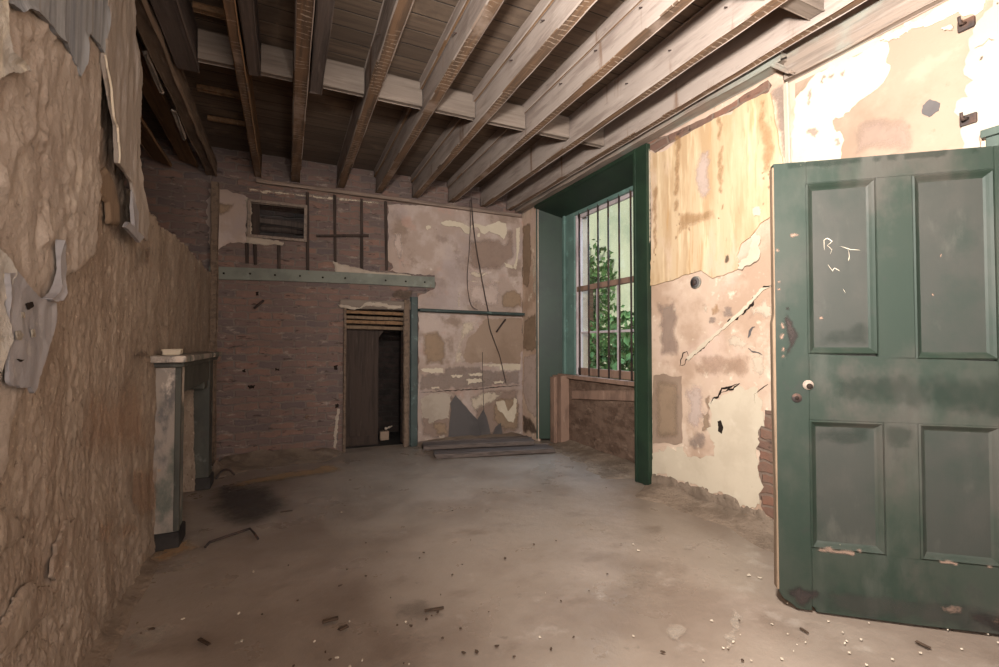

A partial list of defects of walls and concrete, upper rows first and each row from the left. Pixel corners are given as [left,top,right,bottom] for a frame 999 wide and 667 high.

peeling [791,0,999,163]
flaking render [0,0,150,482]
flaking render [426,220,520,269]
flaking render [420,317,523,438]
crack [680,285,771,366]
crack [711,383,768,402]
water stain [216,465,338,520]
flaking render [651,410,774,523]